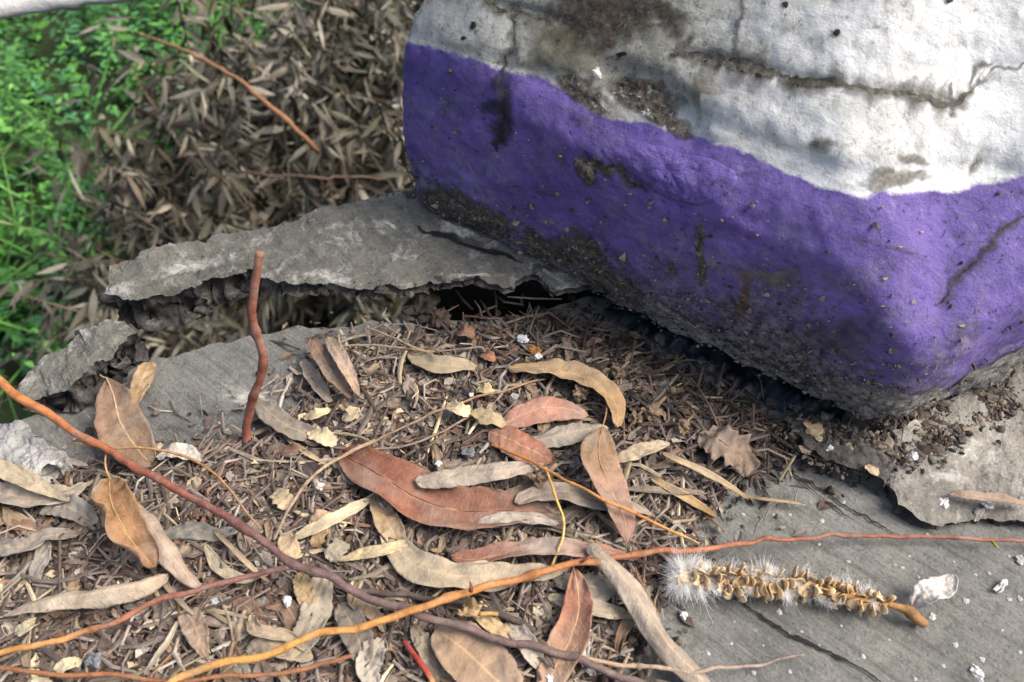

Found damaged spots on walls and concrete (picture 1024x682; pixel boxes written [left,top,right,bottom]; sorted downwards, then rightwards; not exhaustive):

crack [484,0,565,152]
crack [669,0,1024,117]
crack [415,224,523,263]
crack [935,216,1024,306]